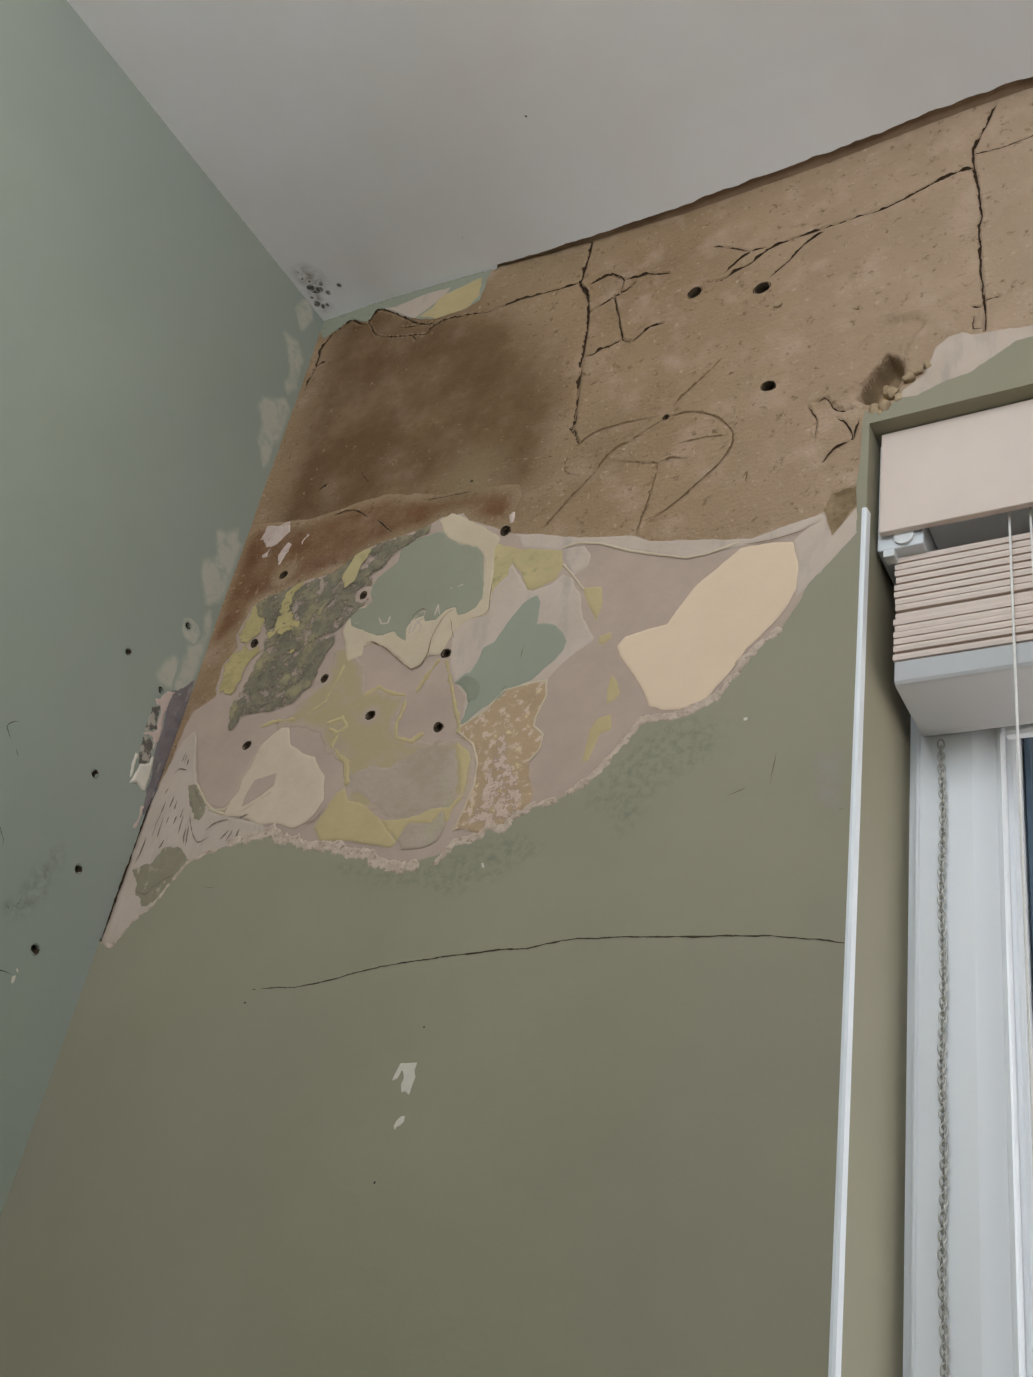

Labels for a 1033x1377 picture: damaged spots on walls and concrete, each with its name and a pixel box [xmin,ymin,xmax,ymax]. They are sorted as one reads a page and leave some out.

crack [715,105,1033,331]
leakage [158,260,596,787]
peeling [101,77,1033,948]
crack [809,398,859,462]
crack [253,934,843,990]
peeling [392,1063,417,1094]